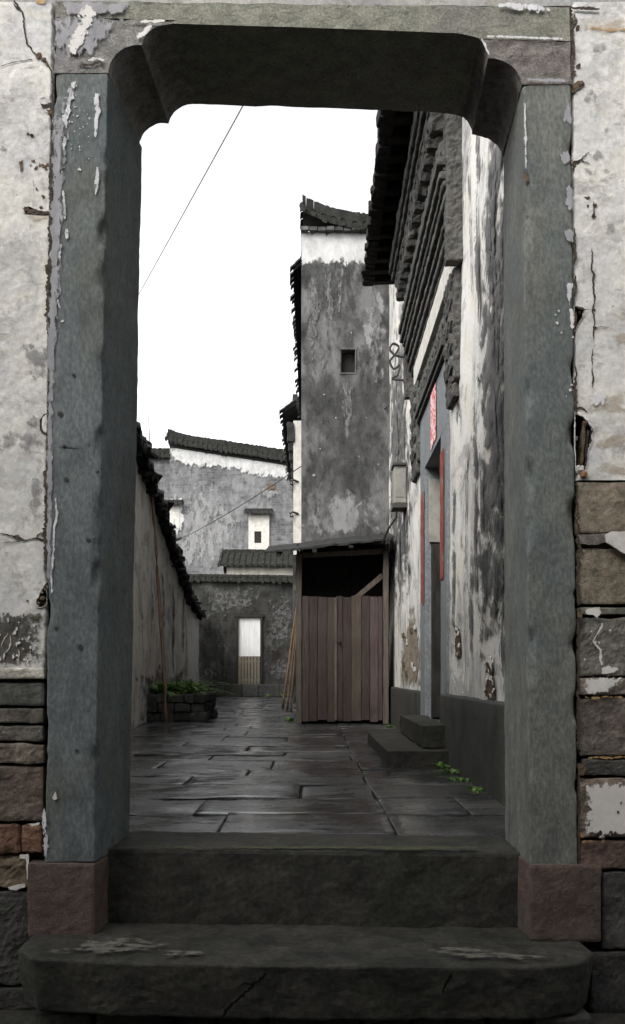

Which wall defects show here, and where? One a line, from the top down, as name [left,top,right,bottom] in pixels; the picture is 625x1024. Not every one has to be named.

crack [2,0,54,83]
crack [585,196,597,219]
crack [577,249,602,412]
leakage [452,135,505,687]
crack [0,528,48,555]
flaking render [400,606,420,690]
flaking render [483,656,495,698]
peeling [580,782,625,843]
crack [221,973,267,1019]